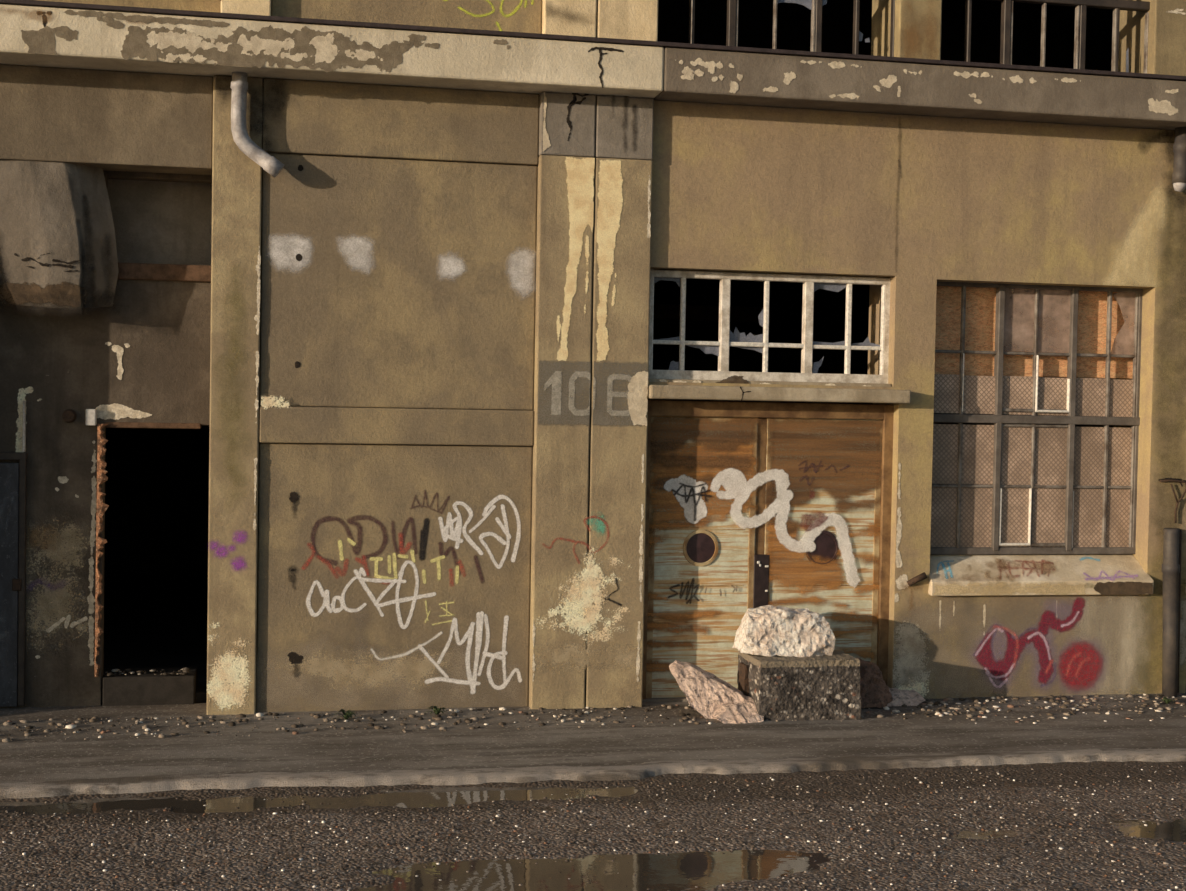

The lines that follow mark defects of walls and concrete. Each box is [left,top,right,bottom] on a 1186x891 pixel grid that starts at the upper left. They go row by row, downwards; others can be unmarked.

peeling [21,10,440,72]
crack [566,47,624,141]
peeling [763,60,862,92]
peeling [954,71,1037,84]
peeling [1148,89,1178,116]
damp [1105,175,1186,404]
spalling [105,342,130,380]
spalling [26,403,152,677]
rust [649,416,883,659]
spalling [207,621,251,712]
spalling [532,504,644,682]
rust [646,593,720,672]